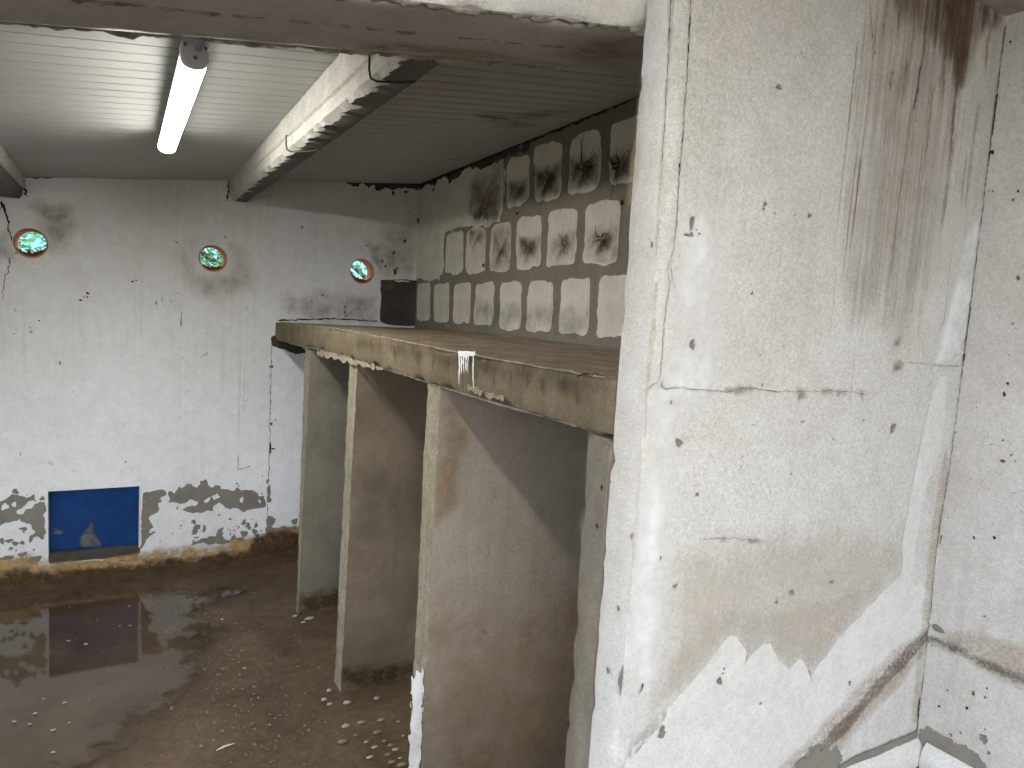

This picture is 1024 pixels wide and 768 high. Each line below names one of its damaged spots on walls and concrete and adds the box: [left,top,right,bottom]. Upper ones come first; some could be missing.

damp [573,139,630,196]
crack [646,0,865,397]
crack [0,177,48,298]
damp [470,230,507,264]
damp [433,351,504,388]
peeling [0,489,47,563]
peeling [140,475,298,549]
damp [0,527,299,586]
peeling [795,726,991,768]